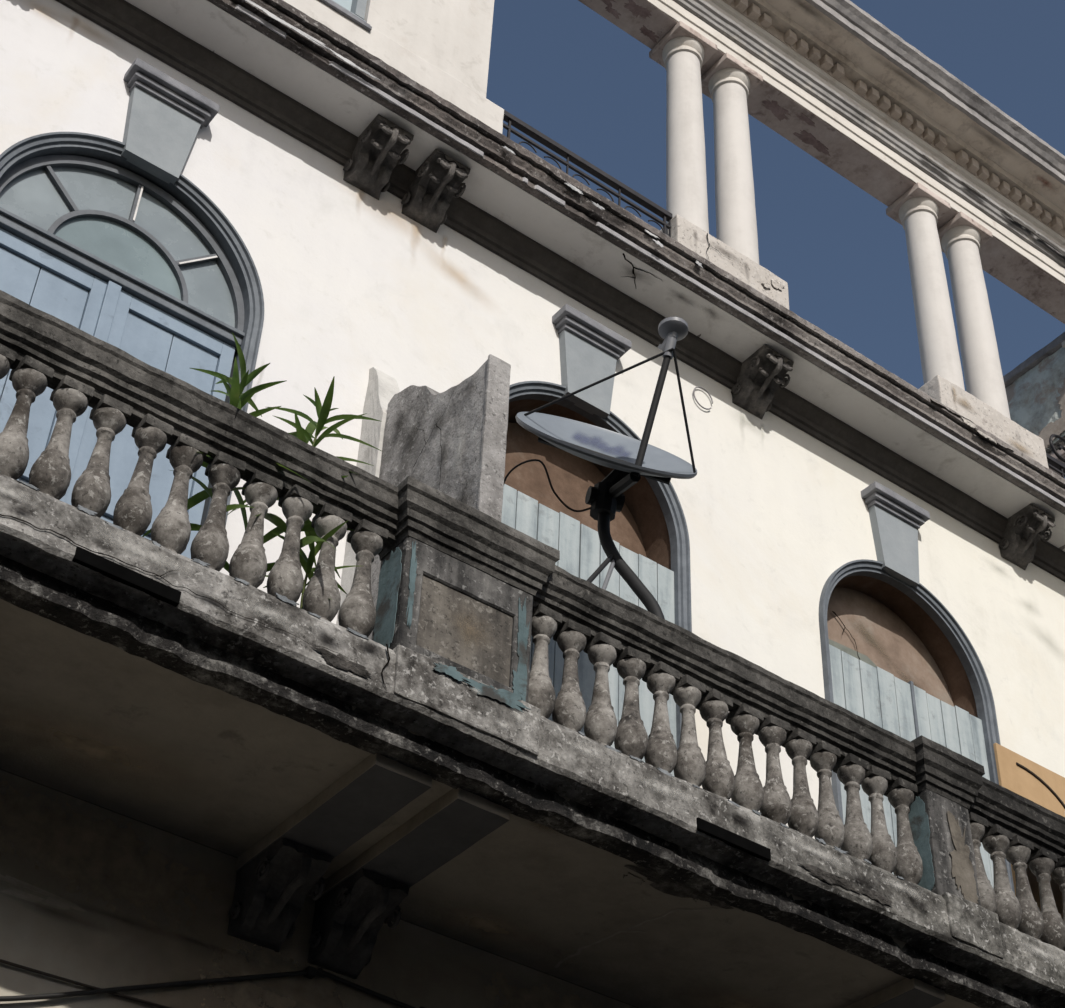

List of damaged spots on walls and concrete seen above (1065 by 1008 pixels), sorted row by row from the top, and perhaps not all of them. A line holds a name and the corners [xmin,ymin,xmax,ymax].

peeling [601,0,659,43]
peeling [762,100,830,156]
crack [623,253,659,287]
peeling [1038,378,1065,454]
crack [0,514,352,660]
leakage [198,591,224,606]
peeling [347,541,417,648]
leakage [321,631,336,644]
crack [381,644,390,689]
peeling [433,597,531,713]